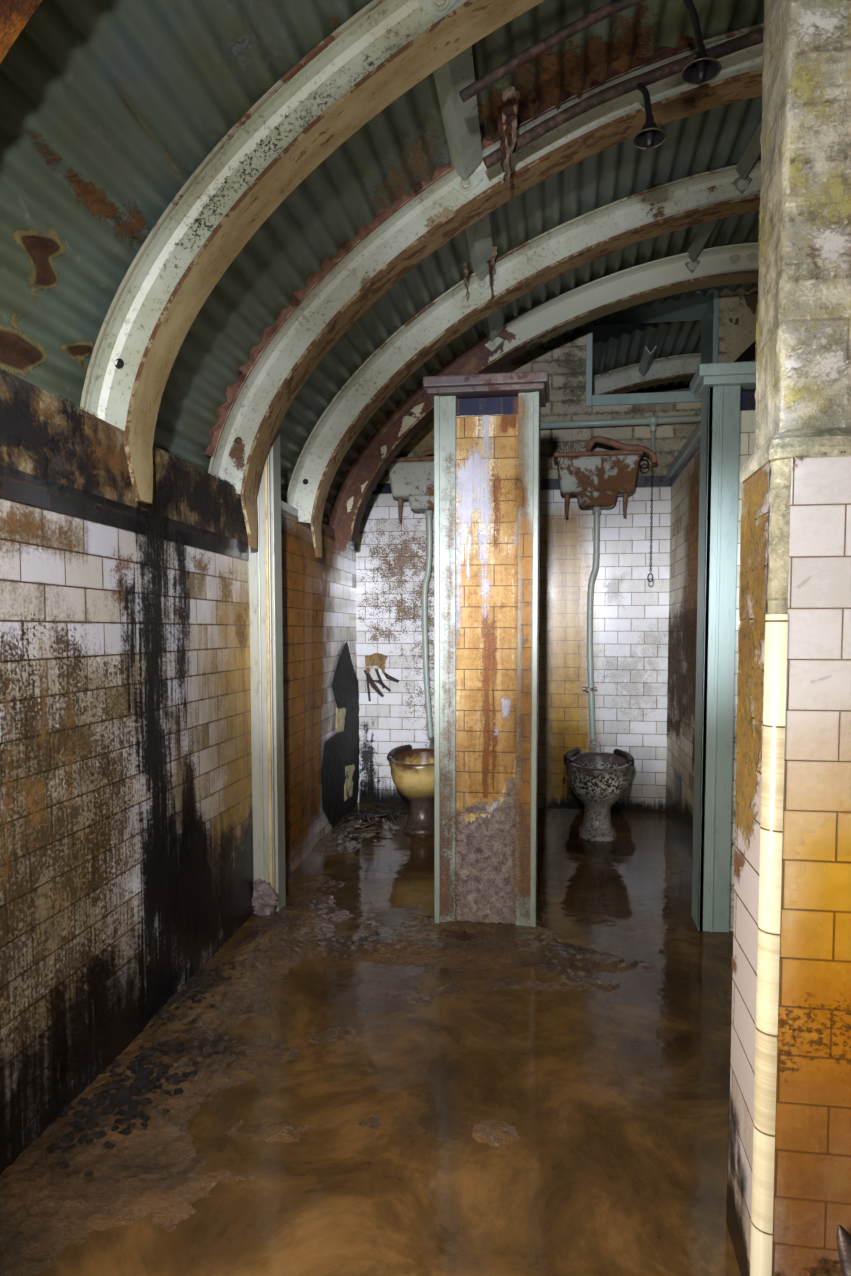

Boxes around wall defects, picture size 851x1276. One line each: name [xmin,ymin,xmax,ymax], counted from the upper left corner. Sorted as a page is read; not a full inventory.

rust [27,130,149,248]
rust [497,86,520,185]
rust [13,223,68,303]
rust [0,313,95,377]
damp [0,389,132,506]
rust [229,438,245,474]
damp [358,510,434,747]
rust [440,404,533,920]
peeling [495,698,511,735]
damp [0,453,254,1175]
spalling [456,777,516,924]
damp [776,801,851,1104]